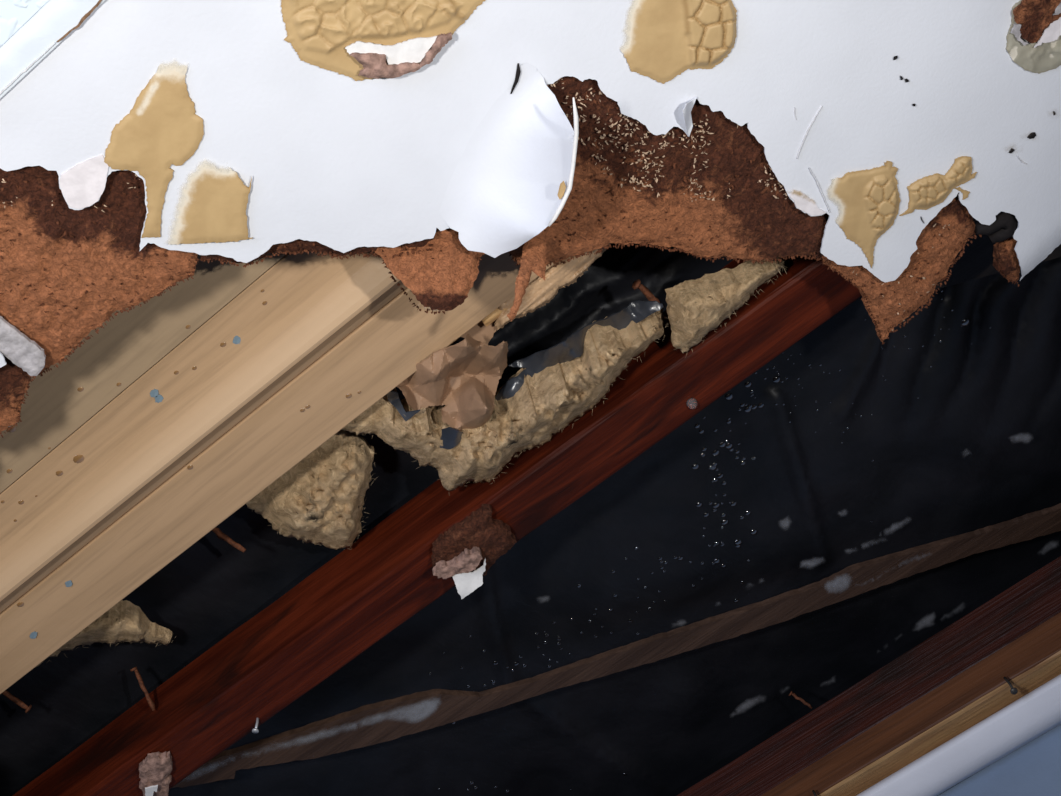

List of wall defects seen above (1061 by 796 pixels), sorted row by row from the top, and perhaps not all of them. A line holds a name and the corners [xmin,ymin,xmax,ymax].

spalling [0,62,1020,438]
peeling [432,547,486,599]
peeling [145,785,158,796]